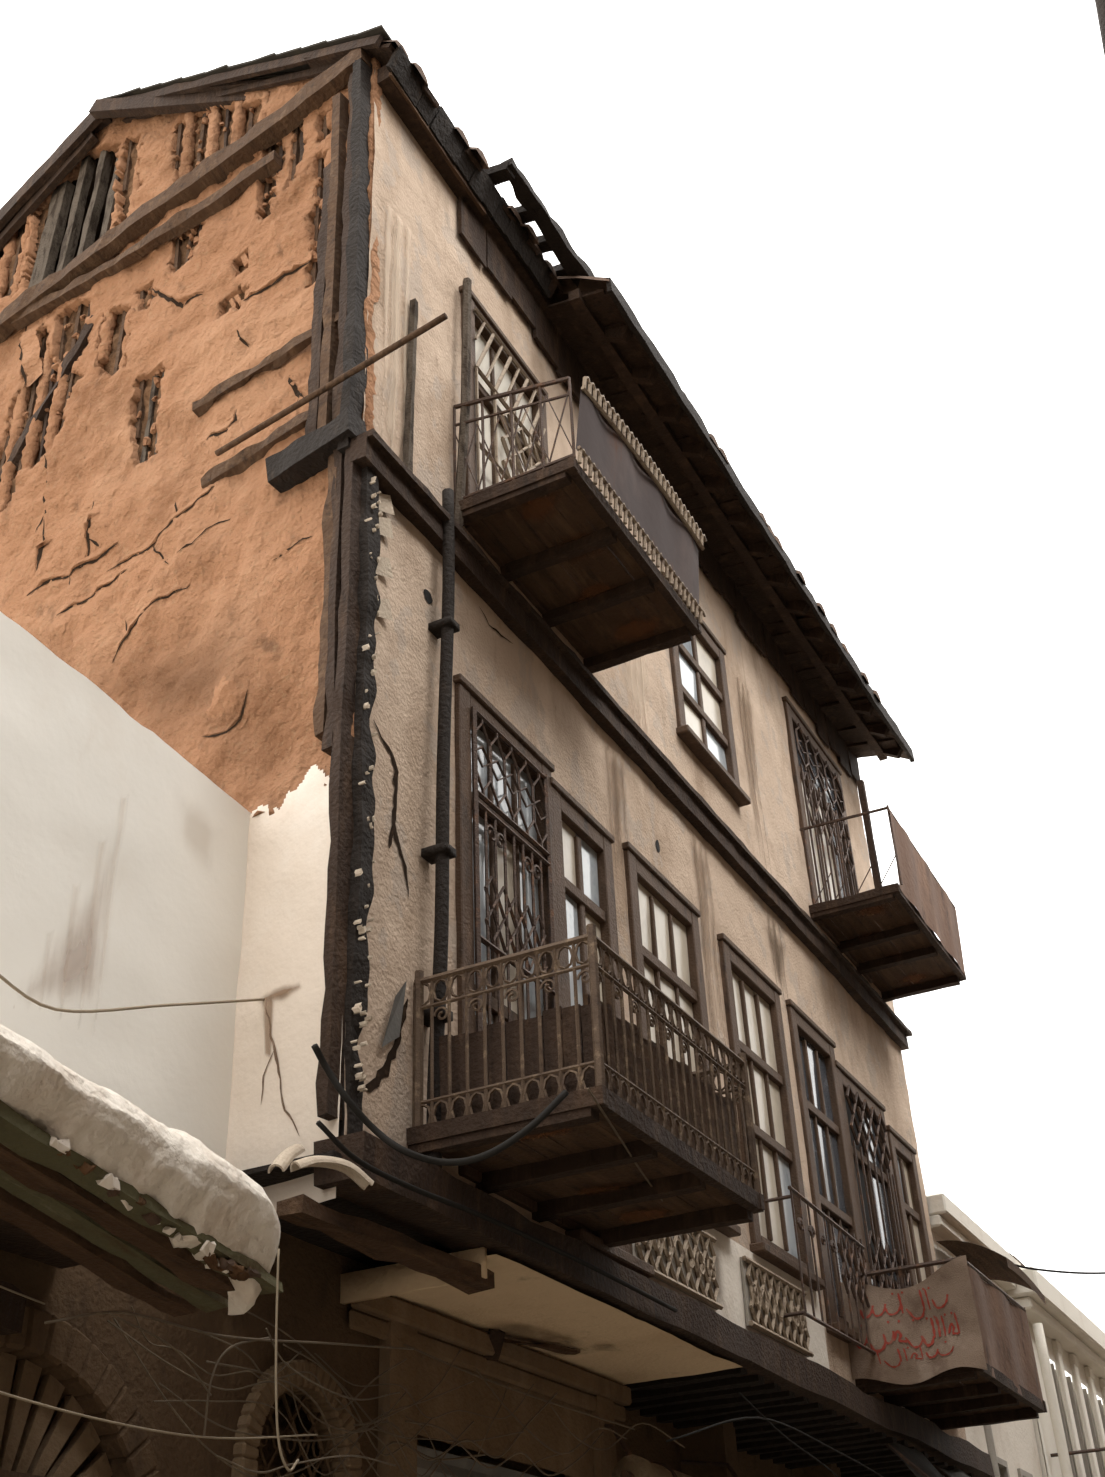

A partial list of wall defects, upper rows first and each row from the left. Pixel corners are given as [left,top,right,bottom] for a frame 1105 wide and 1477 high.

spalling [171,90,270,178]
spalling [0,203,50,298]
crack [153,277,209,308]
spalling [253,124,325,285]
spalling [0,285,155,512]
spalling [135,369,165,463]
crack [25,451,230,662]
crack [202,689,248,737]
peeling [338,466,408,1136]
spalling [50,1135,184,1242]
spalling [200,1240,261,1281]